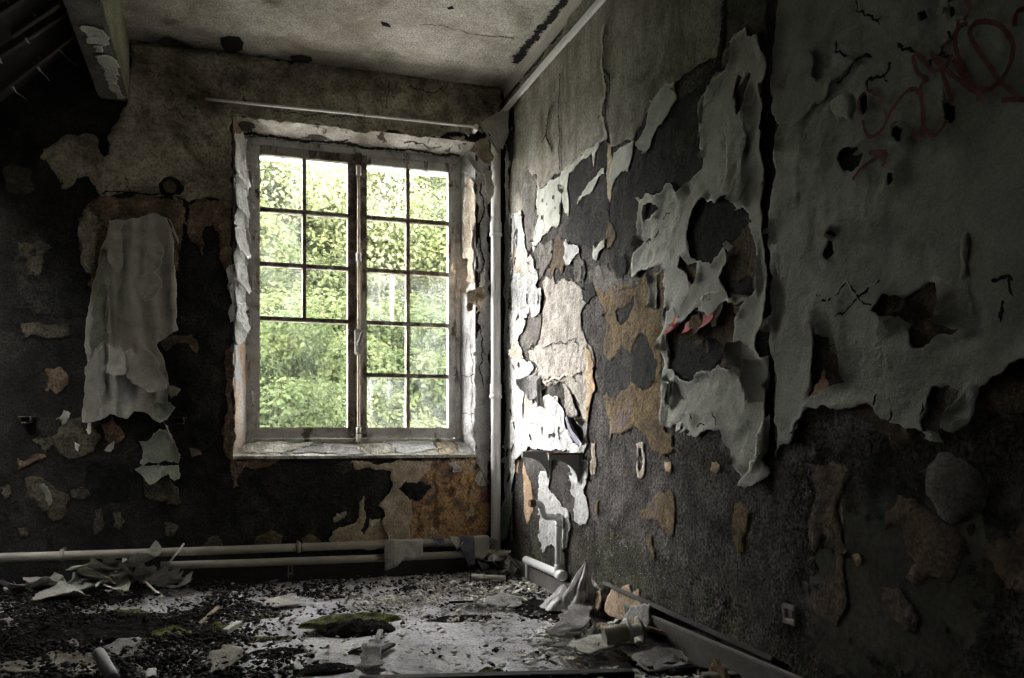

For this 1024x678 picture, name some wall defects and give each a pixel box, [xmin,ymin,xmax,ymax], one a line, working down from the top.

peeling [12,0,1024,543]
crack [815,279,880,317]